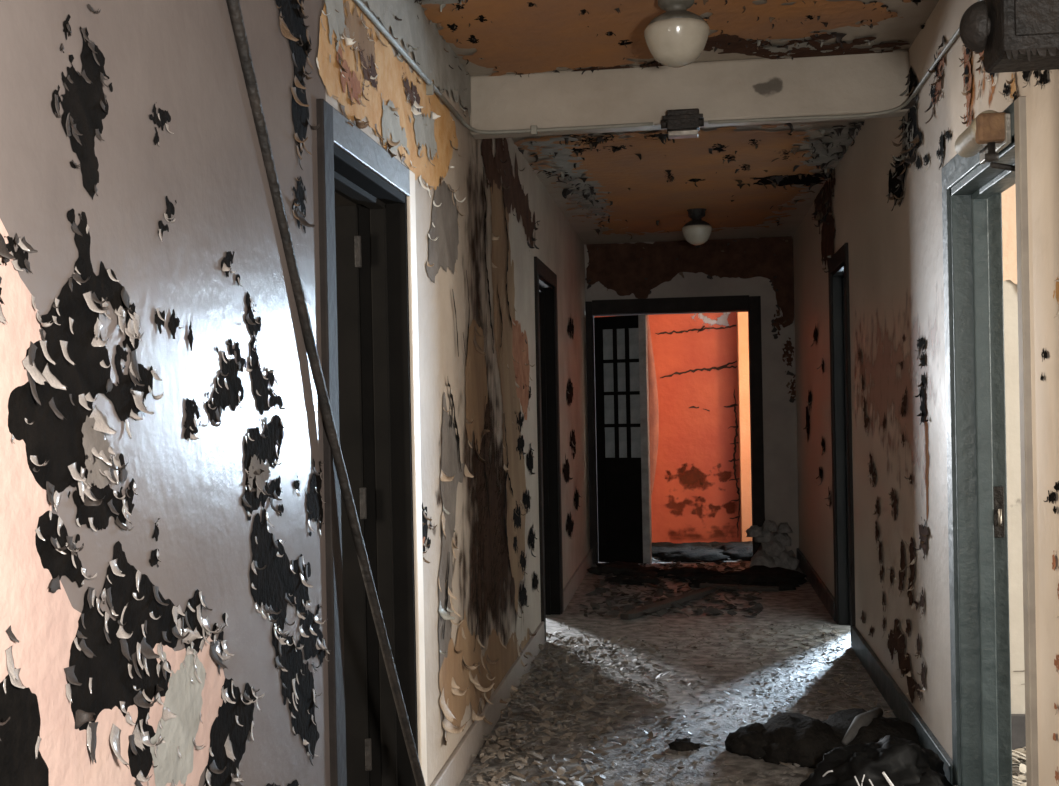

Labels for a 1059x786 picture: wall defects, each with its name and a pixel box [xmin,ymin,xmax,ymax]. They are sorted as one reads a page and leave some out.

peeling [51,15,113,200]
peeling [150,102,174,147]
peeling [158,196,177,241]
peeling [276,0,666,283]
peeling [886,35,950,210]
peeling [959,45,1049,127]
peeling [0,209,264,786]
peeling [184,251,331,765]
peeling [422,122,864,745]
crack [656,325,737,335]
peeling [860,454,929,703]
peeling [900,334,929,425]